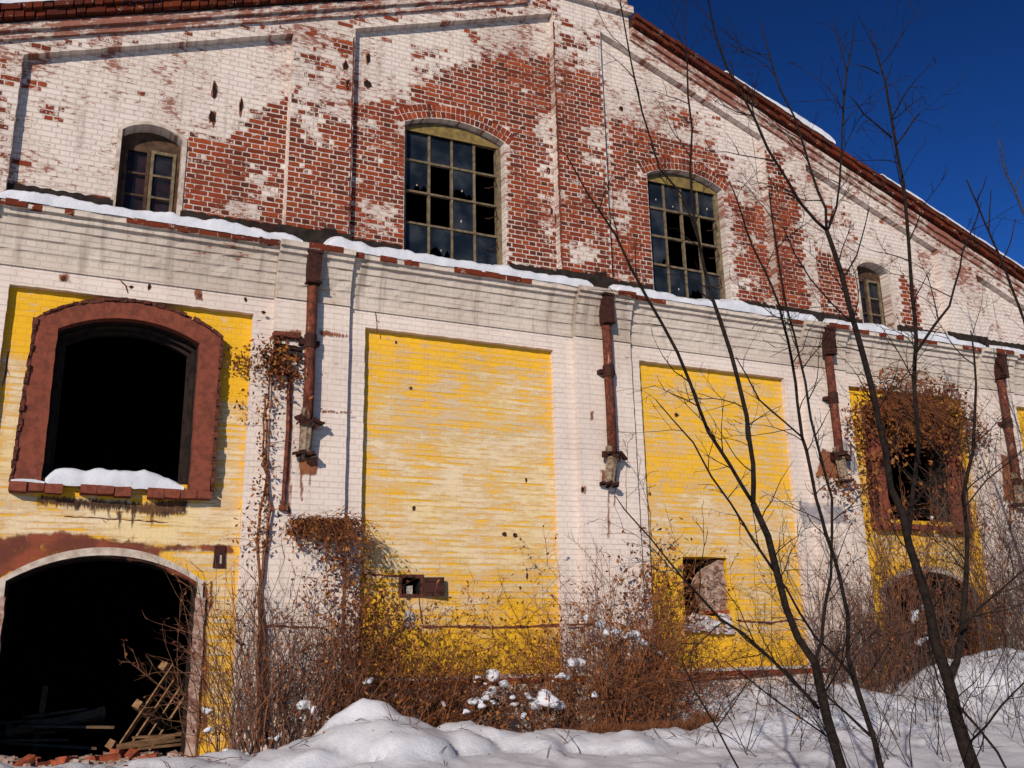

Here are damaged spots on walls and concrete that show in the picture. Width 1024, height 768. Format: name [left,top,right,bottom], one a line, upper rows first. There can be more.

peeling [0,39,81,180]
peeling [183,0,860,319]
peeling [898,276,923,329]
damp [38,495,188,524]
corrosion [287,377,318,516]
corrosion [816,448,839,506]
corrosion [1001,455,1014,533]